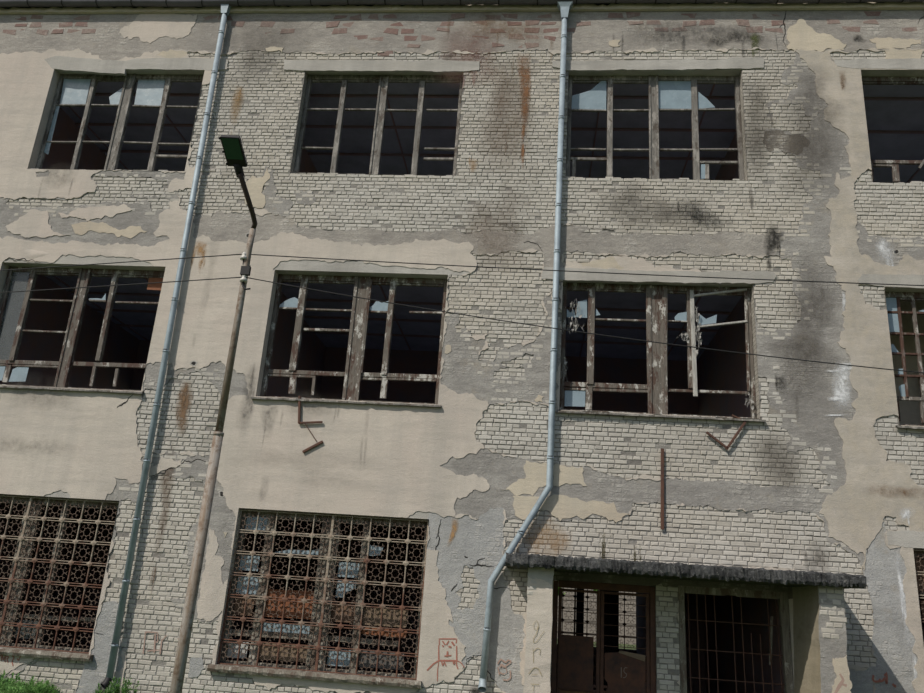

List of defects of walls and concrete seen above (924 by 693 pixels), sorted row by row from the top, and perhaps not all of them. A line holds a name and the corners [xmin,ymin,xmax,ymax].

corrosion [520,66,530,134]
leakage [766,229,781,267]
flaking render [0,13,561,554]
flaking render [389,10,924,575]
corrosion [177,386,190,427]
leakage [828,363,852,403]
flaking render [103,361,334,693]
flaking render [457,565,480,610]
flaking render [501,564,554,615]
flaking render [818,588,876,668]
flaking render [411,656,502,693]